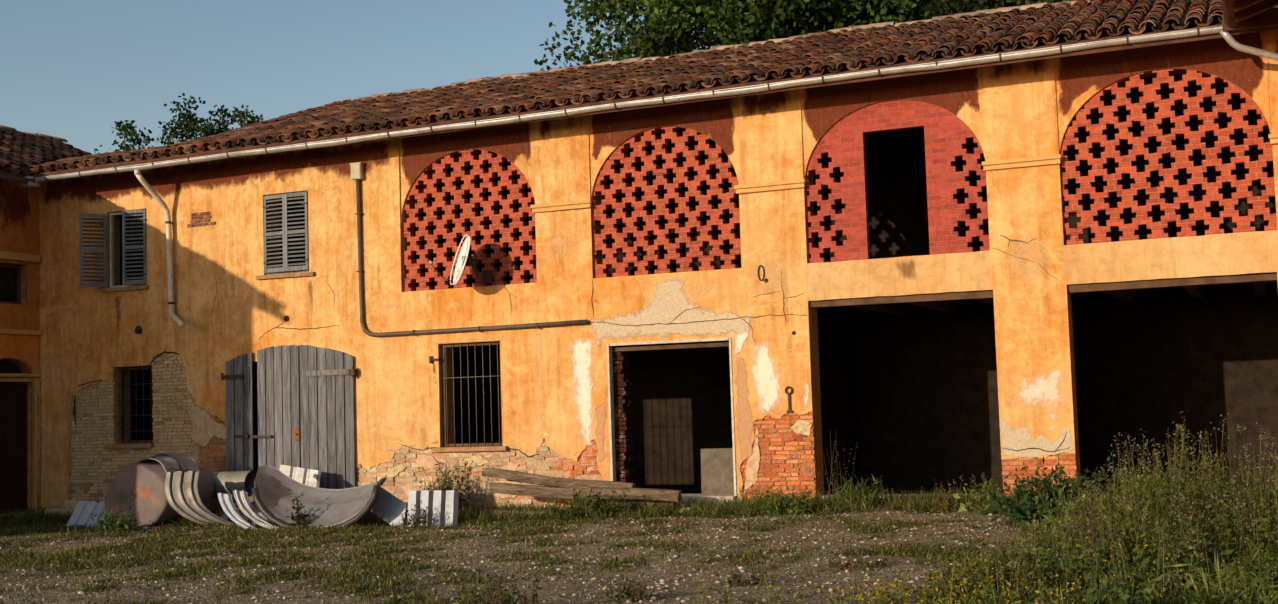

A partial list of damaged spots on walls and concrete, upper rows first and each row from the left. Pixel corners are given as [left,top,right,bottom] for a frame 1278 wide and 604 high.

crack [991,235,1057,280]
crack [257,280,338,341]
spalling [68,354,226,501]
spalling [207,498,222,511]
spalling [355,432,604,512]
spalling [734,329,817,502]
flaking render [999,417,1077,498]